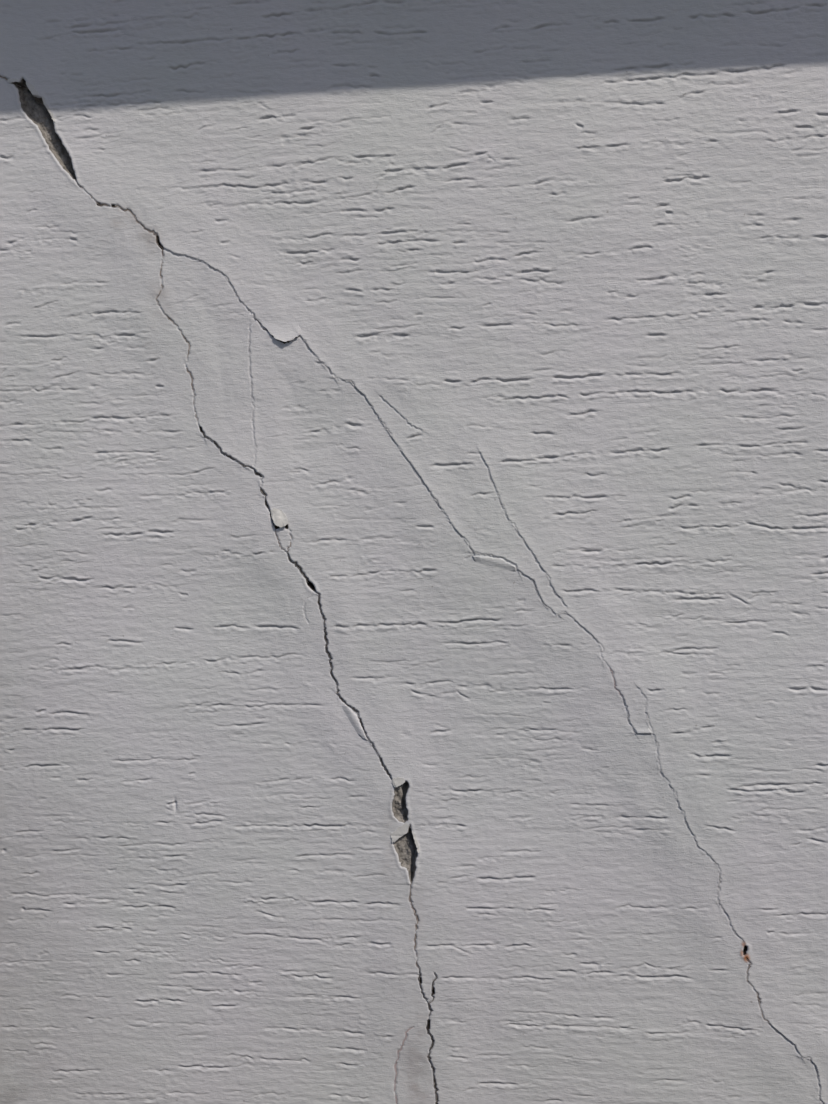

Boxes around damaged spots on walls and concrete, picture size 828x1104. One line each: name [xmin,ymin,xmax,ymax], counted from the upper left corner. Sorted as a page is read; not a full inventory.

flaking render [7,78,76,181]
crack [77,183,441,778]
crack [457,475,677,796]
flaking render [390,777,420,884]
crack [394,882,438,1104]